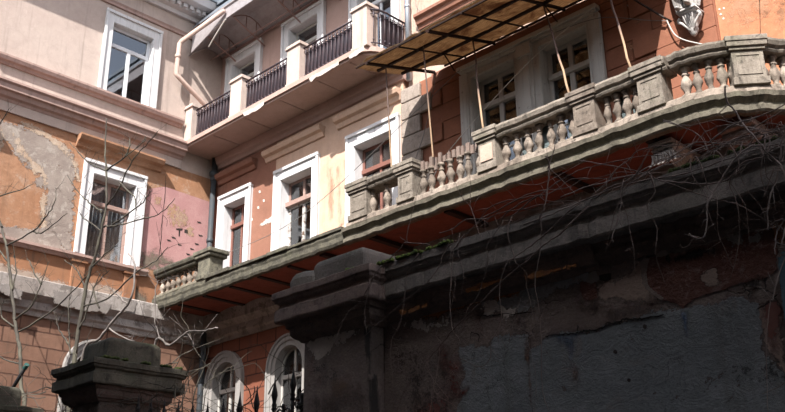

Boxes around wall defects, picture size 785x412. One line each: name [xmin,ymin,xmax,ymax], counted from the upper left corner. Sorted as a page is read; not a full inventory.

flaking render [0,119,81,252]
peeling [0,283,23,300]
peeling [53,290,111,314]
peeling [598,263,657,303]